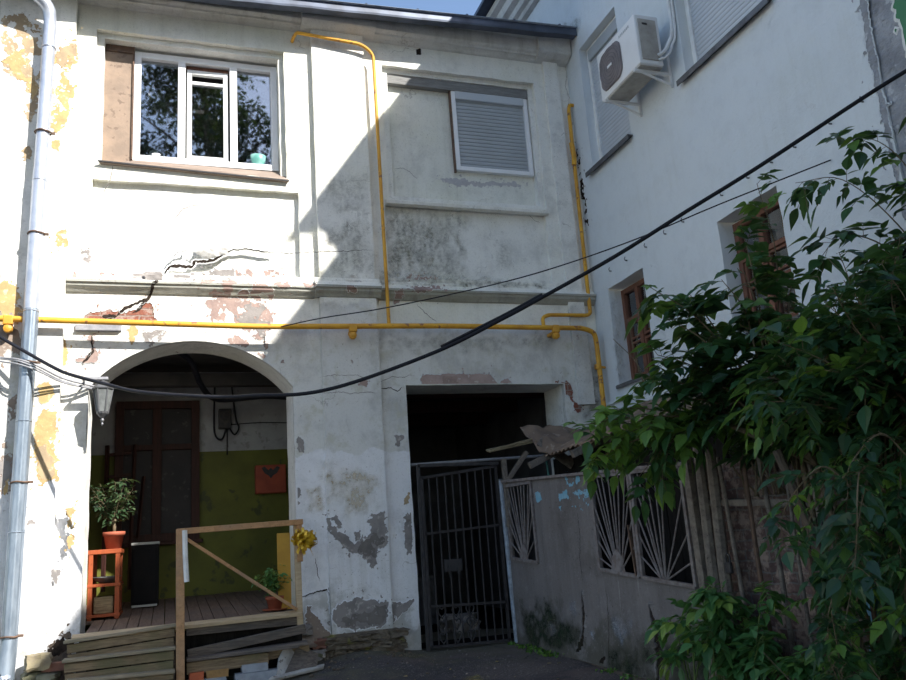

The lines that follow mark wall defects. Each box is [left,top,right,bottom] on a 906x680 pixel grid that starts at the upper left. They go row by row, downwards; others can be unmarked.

peeling [1,10,42,123]
peeling [50,27,82,153]
spalling [851,0,906,183]
crack [116,246,370,317]
peeling [170,260,318,359]
flaking render [0,441,13,496]
flaking render [0,387,17,423]
peeling [30,381,64,490]
spalling [419,365,512,384]
flaking render [322,492,413,570]
flaking render [304,588,415,638]
crack [575,515,609,664]